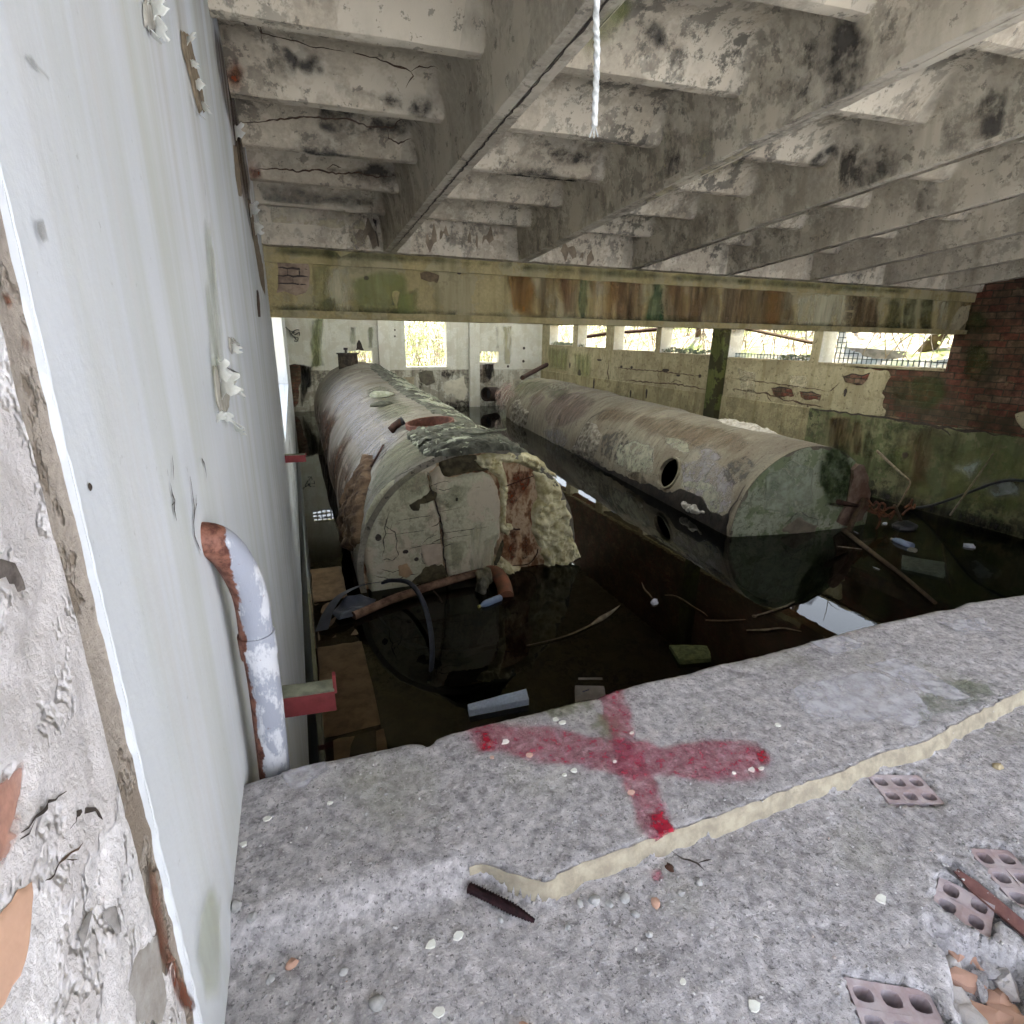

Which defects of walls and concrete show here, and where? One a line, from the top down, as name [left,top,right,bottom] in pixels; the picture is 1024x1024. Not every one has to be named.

peeling [143,0,212,120]
crack [225,20,437,87]
leakage [827,19,866,98]
crack [373,0,609,249]
leakage [812,145,890,187]
leakage [980,94,1005,139]
peeling [213,337,246,435]
leakage [481,327,755,513]
flaking render [772,386,821,400]
flaking render [0,160,204,1024]
crack [20,791,103,881]
crack [673,852,711,870]